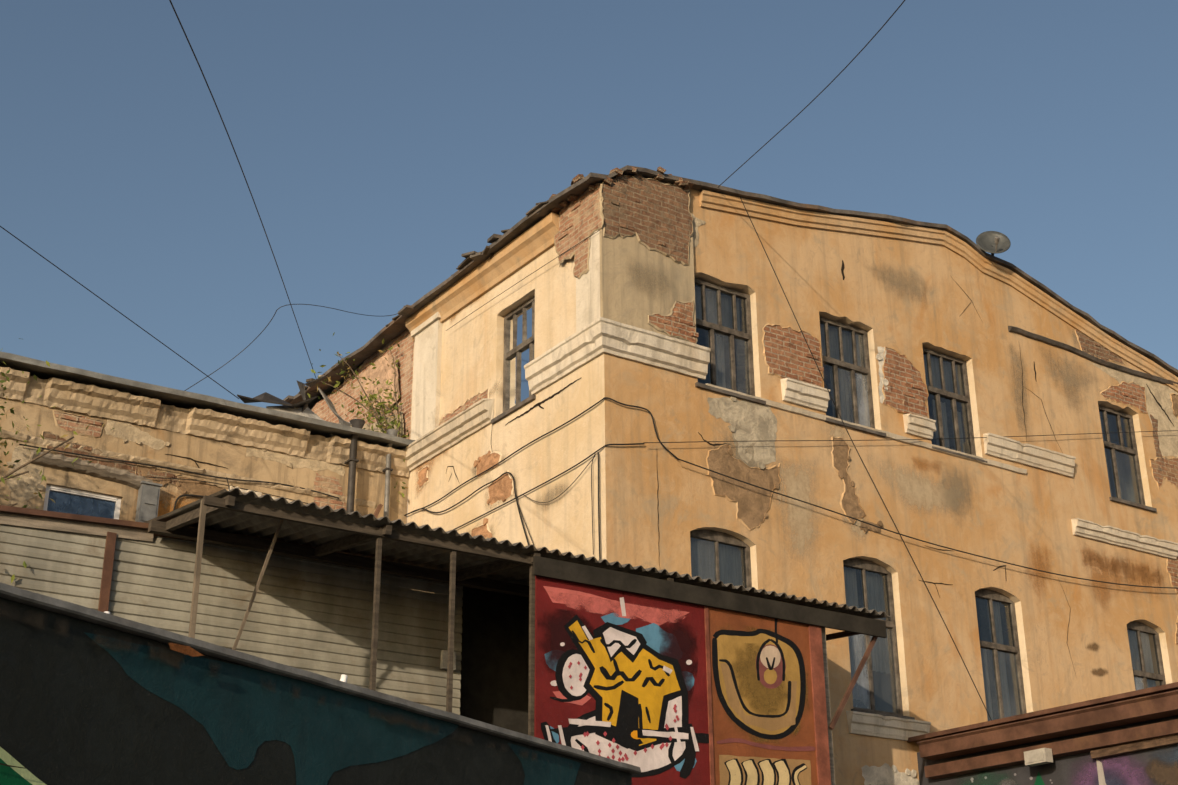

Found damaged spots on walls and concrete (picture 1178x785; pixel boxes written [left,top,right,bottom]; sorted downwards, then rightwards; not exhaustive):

flaking render [549,167,706,279]
flaking render [648,300,699,344]
flaking render [762,323,824,387]
flaking render [876,346,929,418]
peeling [1074,329,1178,490]
spalling [471,451,514,539]
spalling [706,396,781,531]
spalling [830,426,883,537]
flaking render [1166,557,1178,595]
peeling [862,763,920,785]